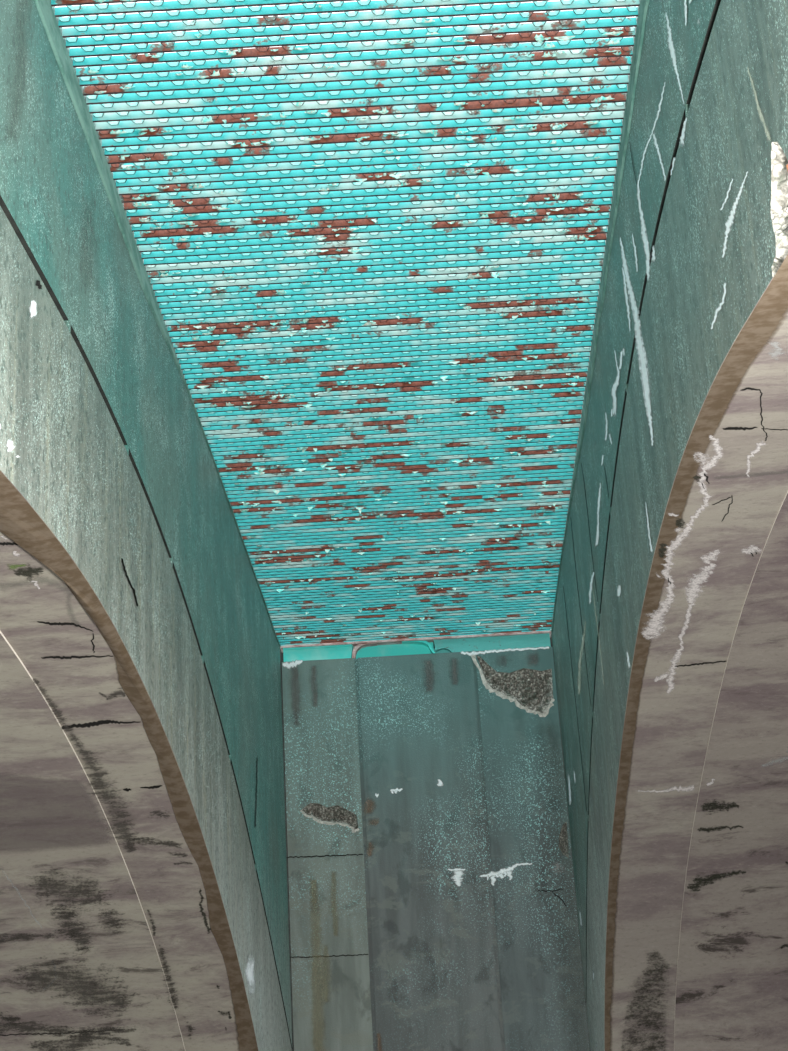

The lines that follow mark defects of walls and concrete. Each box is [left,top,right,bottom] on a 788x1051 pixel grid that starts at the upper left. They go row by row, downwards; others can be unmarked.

crack [684,0,692,25]
crack [629,82,666,281]
spalling [771,142,788,277]
crack [642,387,788,694]
spalling [461,647,555,717]
damp [578,572,604,692]
damp [593,234,788,1051]
spalling [300,803,359,833]